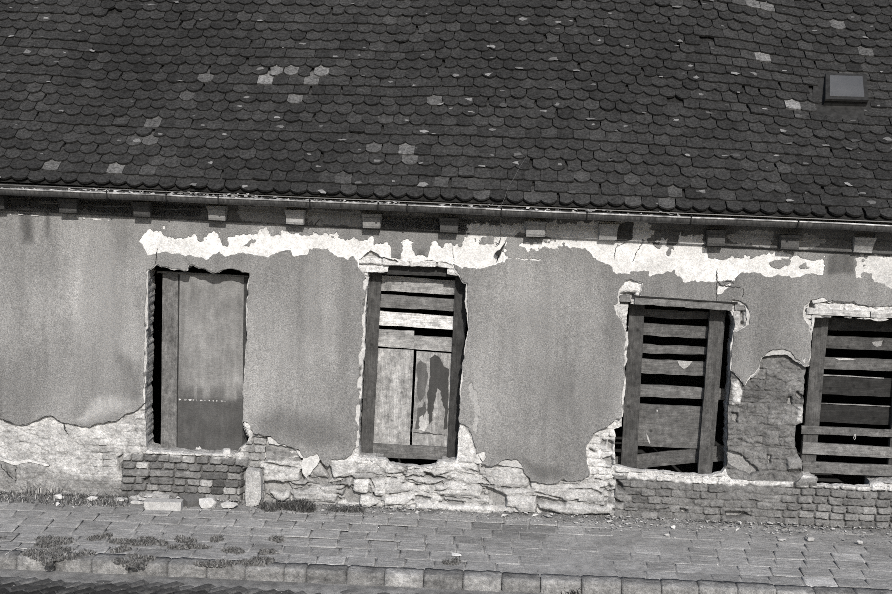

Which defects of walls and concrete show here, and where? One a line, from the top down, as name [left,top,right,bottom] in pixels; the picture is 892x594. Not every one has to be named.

peeling [139,205,825,331]
spalling [804,298,892,330]
peeling [855,254,892,289]
flaking render [0,349,892,529]